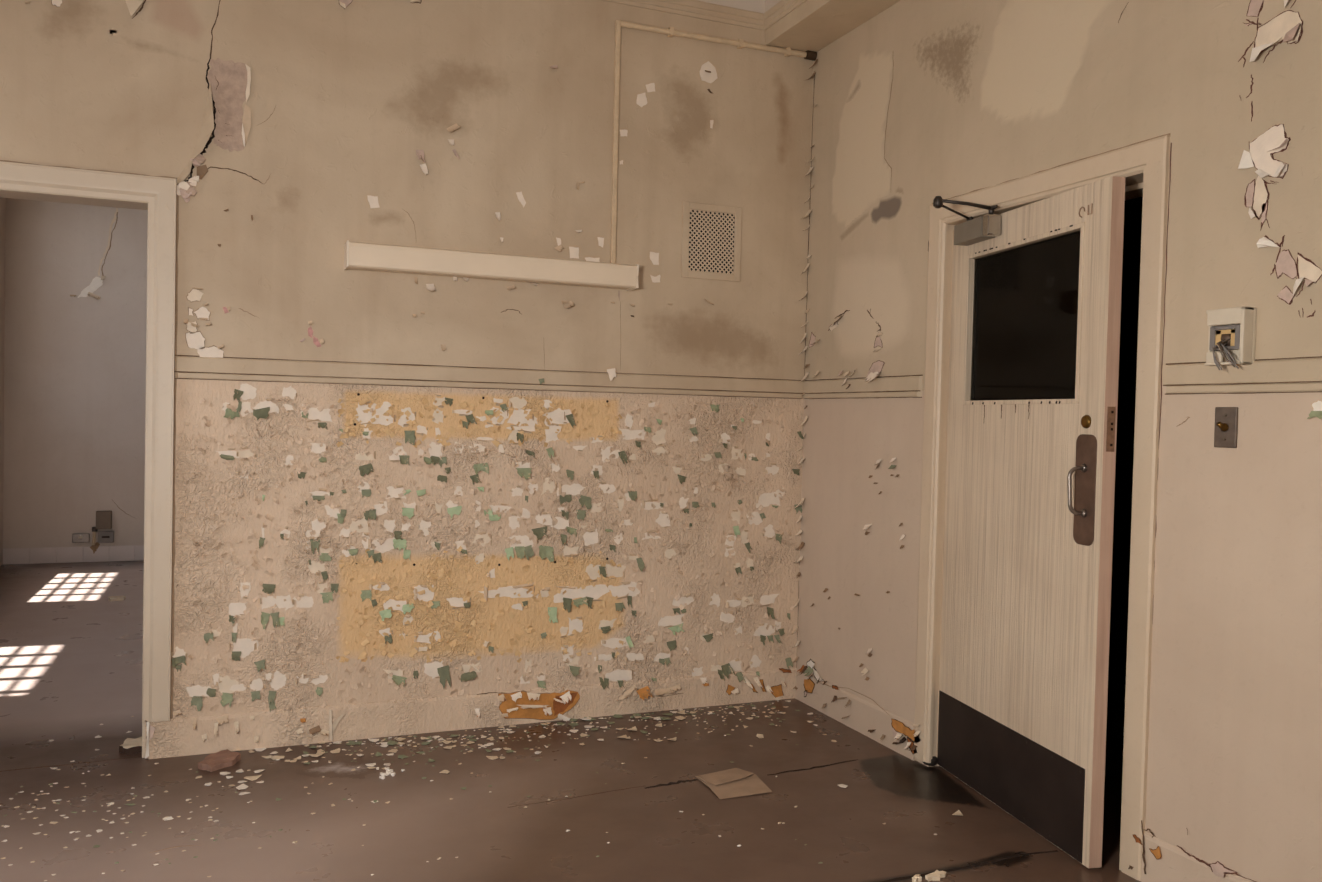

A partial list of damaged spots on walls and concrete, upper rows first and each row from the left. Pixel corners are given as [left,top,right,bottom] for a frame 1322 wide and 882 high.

damp [366,44,525,151]
damp [838,8,989,245]
peeling [1238,0,1303,121]
peeling [1238,124,1322,317]
crack [0,0,923,719]
peeling [171,59,851,774]
peeling [838,309,885,389]
peeling [868,719,921,754]
crack [1133,820,1256,882]